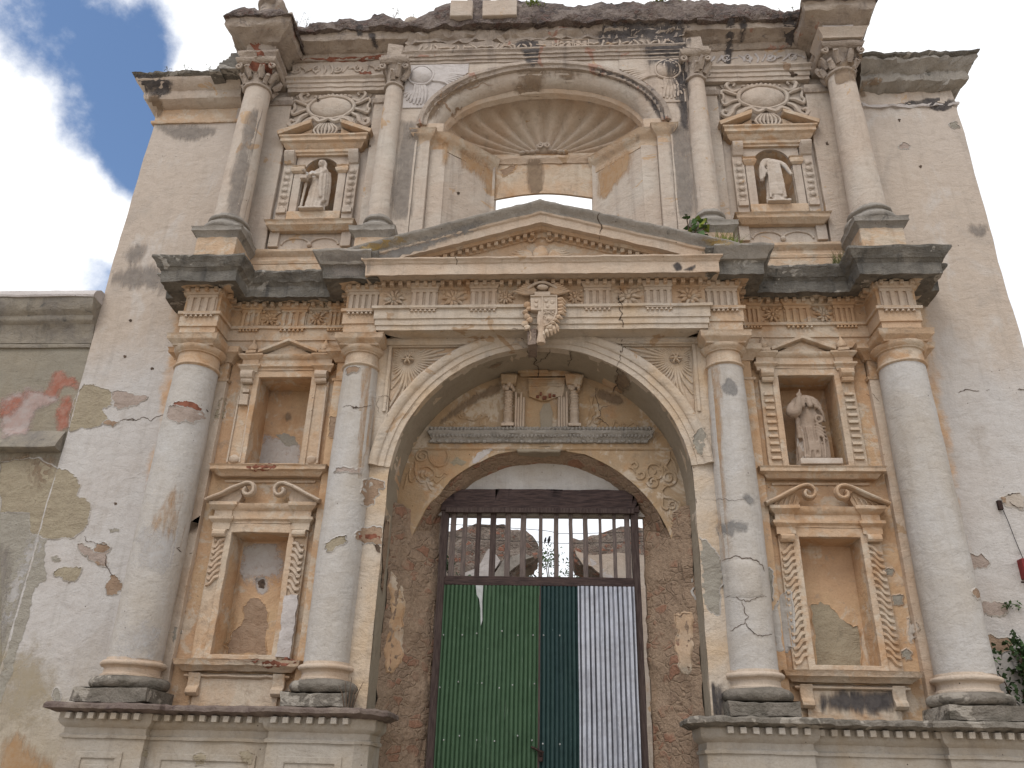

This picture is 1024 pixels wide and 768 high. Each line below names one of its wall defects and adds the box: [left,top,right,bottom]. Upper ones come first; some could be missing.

water stain [228,112,262,216]
crack [595,283,624,424]
spalling [68,383,149,432]
spalling [166,397,228,425]
spalling [333,466,386,508]
spalling [0,457,123,596]
spalling [324,517,390,591]
spalling [223,597,296,669]
crack [727,596,772,636]
spalling [809,600,863,666]
water stain [821,689,894,714]